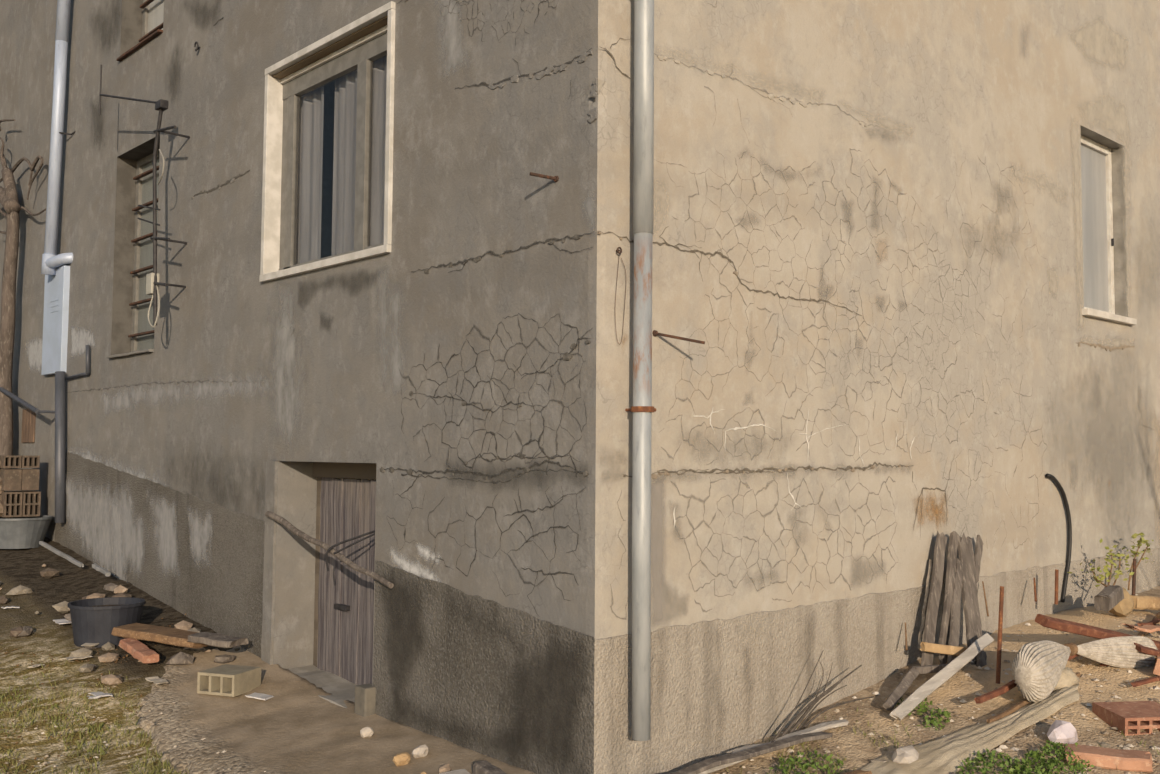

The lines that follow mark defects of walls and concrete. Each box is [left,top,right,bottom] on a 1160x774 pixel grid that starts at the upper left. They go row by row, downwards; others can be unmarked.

crack [440,0,630,97]
crack [380,55,1046,619]